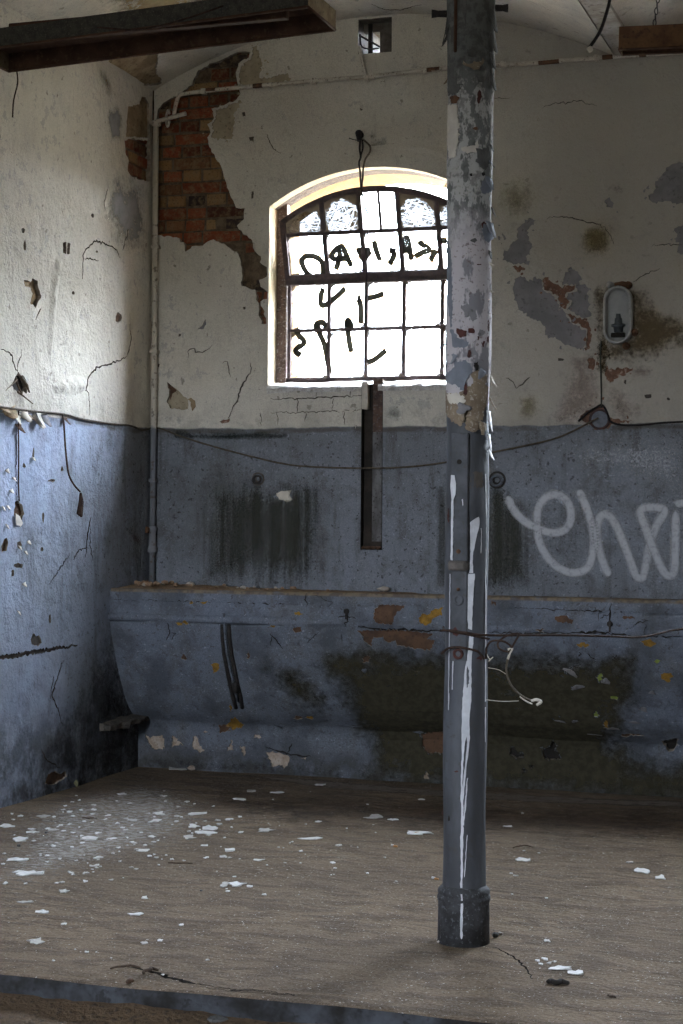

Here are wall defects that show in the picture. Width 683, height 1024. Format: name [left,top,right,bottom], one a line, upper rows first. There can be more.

flaking render [109,43,291,324]
crack [82,219,129,279]
peeling [0,372,52,433]
flaking render [24,279,41,308]
crack [85,324,132,407]
crack [188,348,252,418]
peeling [485,207,633,384]
damp [594,289,683,371]
damp [220,495,309,579]
peeling [357,604,443,673]
crack [0,644,77,726]
crack [131,967,294,996]